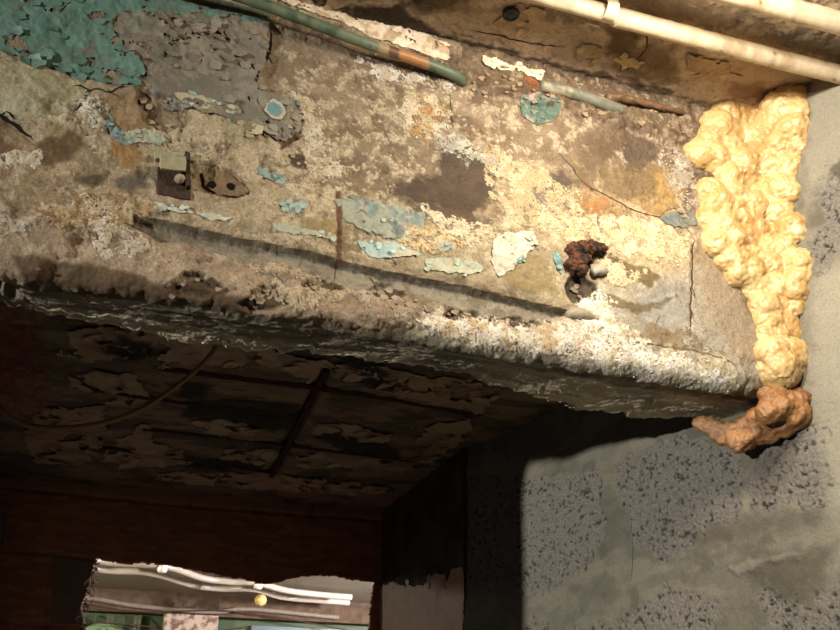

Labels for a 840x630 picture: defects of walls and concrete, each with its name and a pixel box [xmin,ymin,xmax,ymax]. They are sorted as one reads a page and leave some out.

peeling [282,0,450,60]
peeling [0,0,314,173]
crack [0,111,35,142]
peeling [152,202,235,221]
peeling [273,199,337,242]
peeling [334,194,483,276]
spalling [16,255,288,312]
spalling [134,219,609,330]
peeling [22,326,500,497]
flaking render [379,567,464,630]